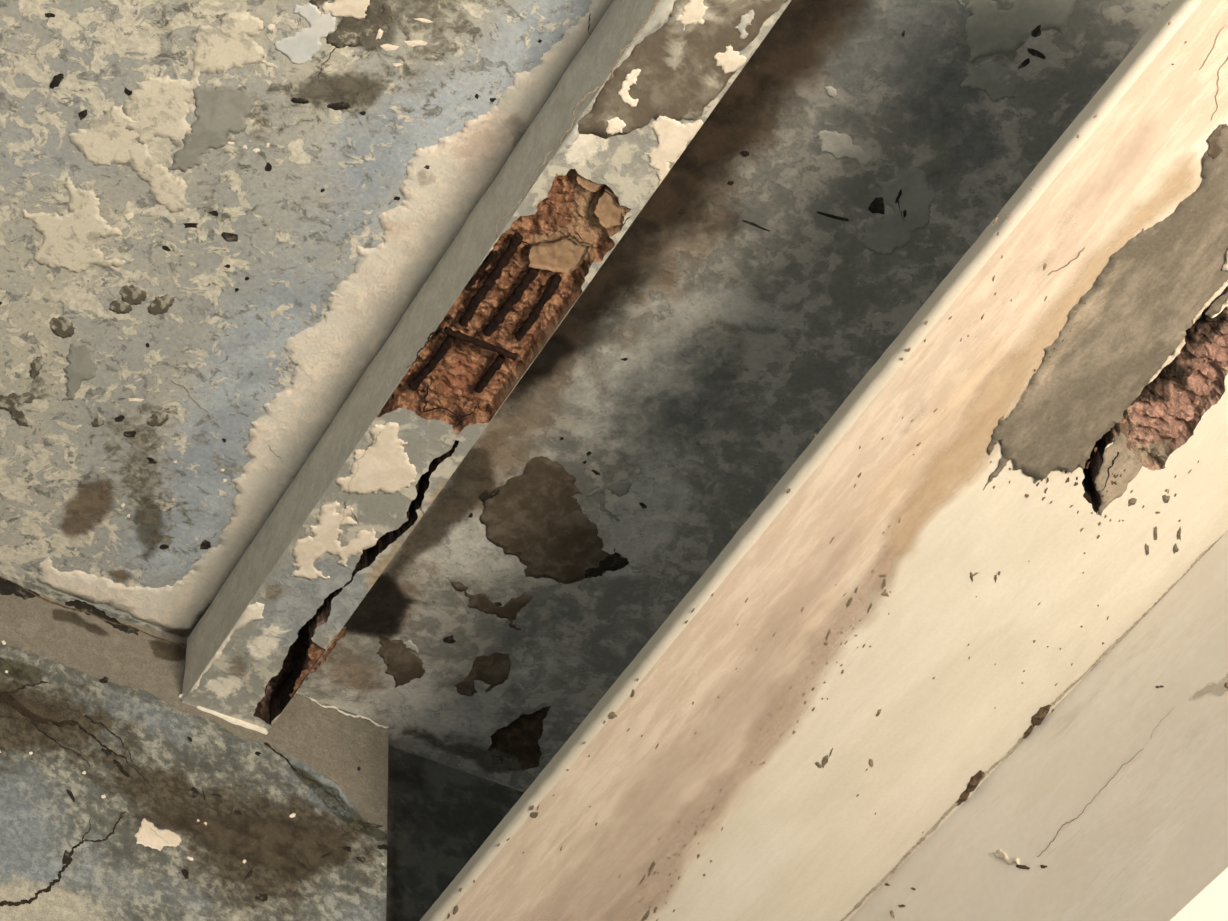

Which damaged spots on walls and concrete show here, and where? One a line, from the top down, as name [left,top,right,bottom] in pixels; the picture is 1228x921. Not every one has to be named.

peeling [957,0,1083,63]
peeling [552,0,788,193]
peeling [22,0,632,631]
flaking render [983,123,1228,515]
damp [385,449,493,583]
damp [0,658,45,683]
crack [0,658,149,783]
crack [253,434,459,845]
peeling [376,637,425,688]
crack [0,811,126,907]
damp [139,810,347,877]
damp [291,767,388,840]